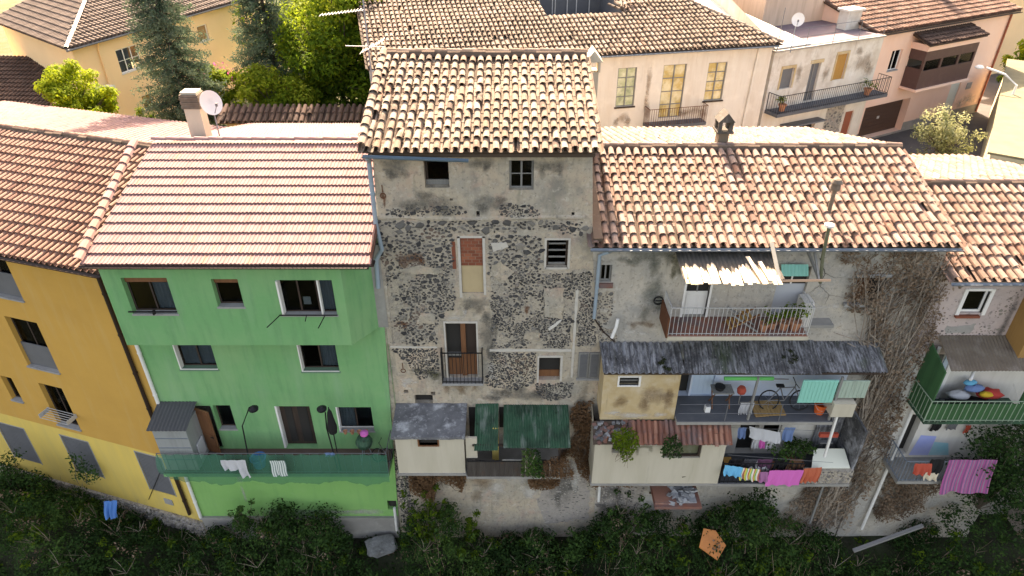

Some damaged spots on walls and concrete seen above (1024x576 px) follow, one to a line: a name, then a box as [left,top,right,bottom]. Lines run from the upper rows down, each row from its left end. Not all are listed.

spalling [376,203,618,401]